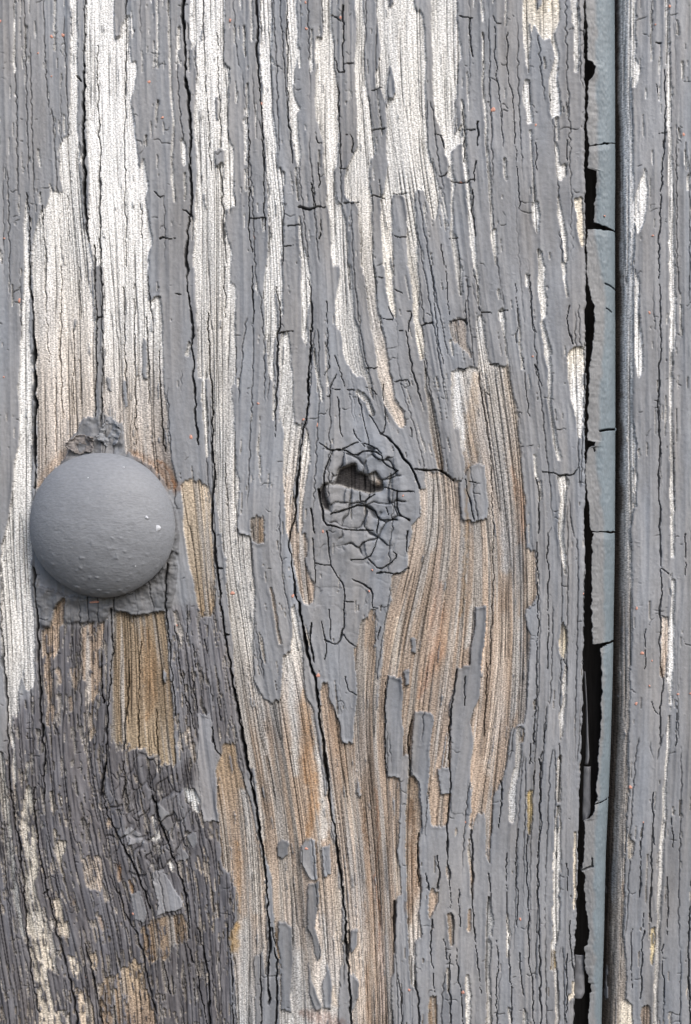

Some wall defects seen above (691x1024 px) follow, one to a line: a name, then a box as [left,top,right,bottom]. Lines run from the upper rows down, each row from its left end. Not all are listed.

crack [27,0,279,1024]
peeling [0,0,543,1024]
crack [248,0,586,1024]